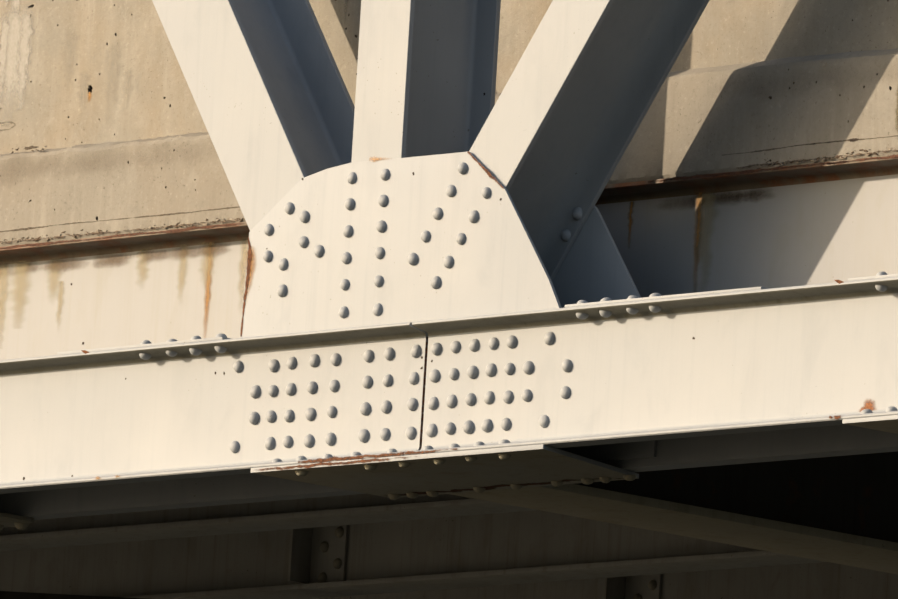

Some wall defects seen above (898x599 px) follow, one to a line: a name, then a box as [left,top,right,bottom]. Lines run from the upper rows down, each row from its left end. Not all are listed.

corrosion [205,242,219,320]
corrosion [240,237,254,337]
corrosion [259,337,457,470]